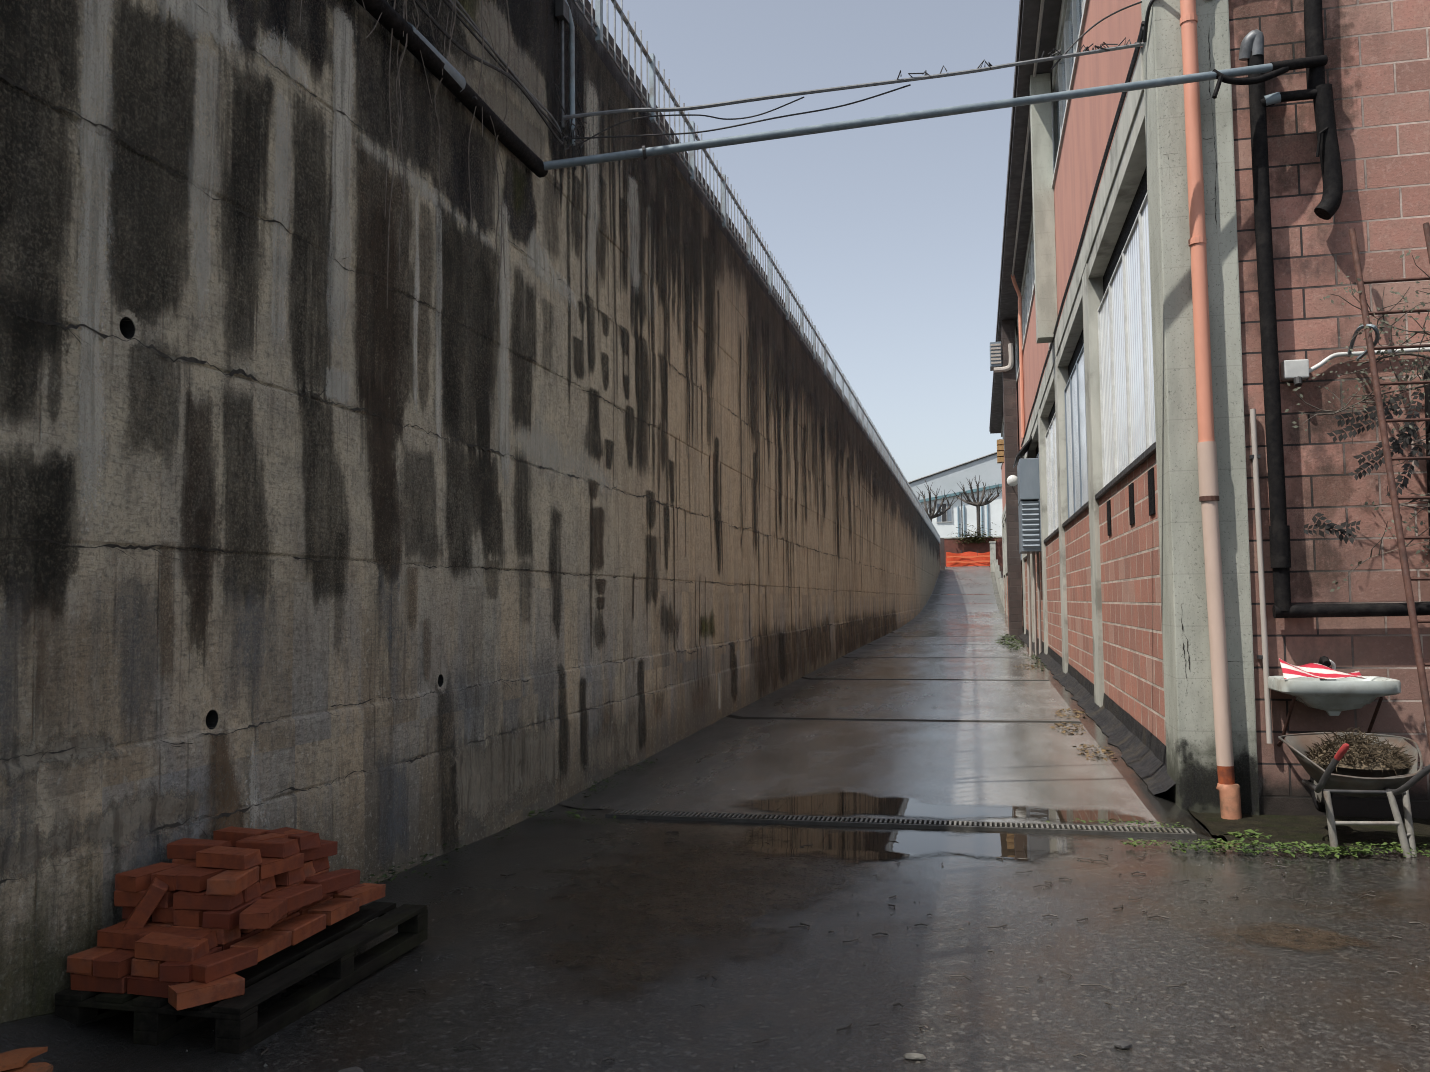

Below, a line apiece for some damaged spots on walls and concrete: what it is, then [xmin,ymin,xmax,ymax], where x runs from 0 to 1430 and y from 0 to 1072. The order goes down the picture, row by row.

crack [0,73,669,435]
crack [195,3,617,326]
leakage [496,0,940,709]
crack [0,304,912,884]
leakage [638,659,646,747]